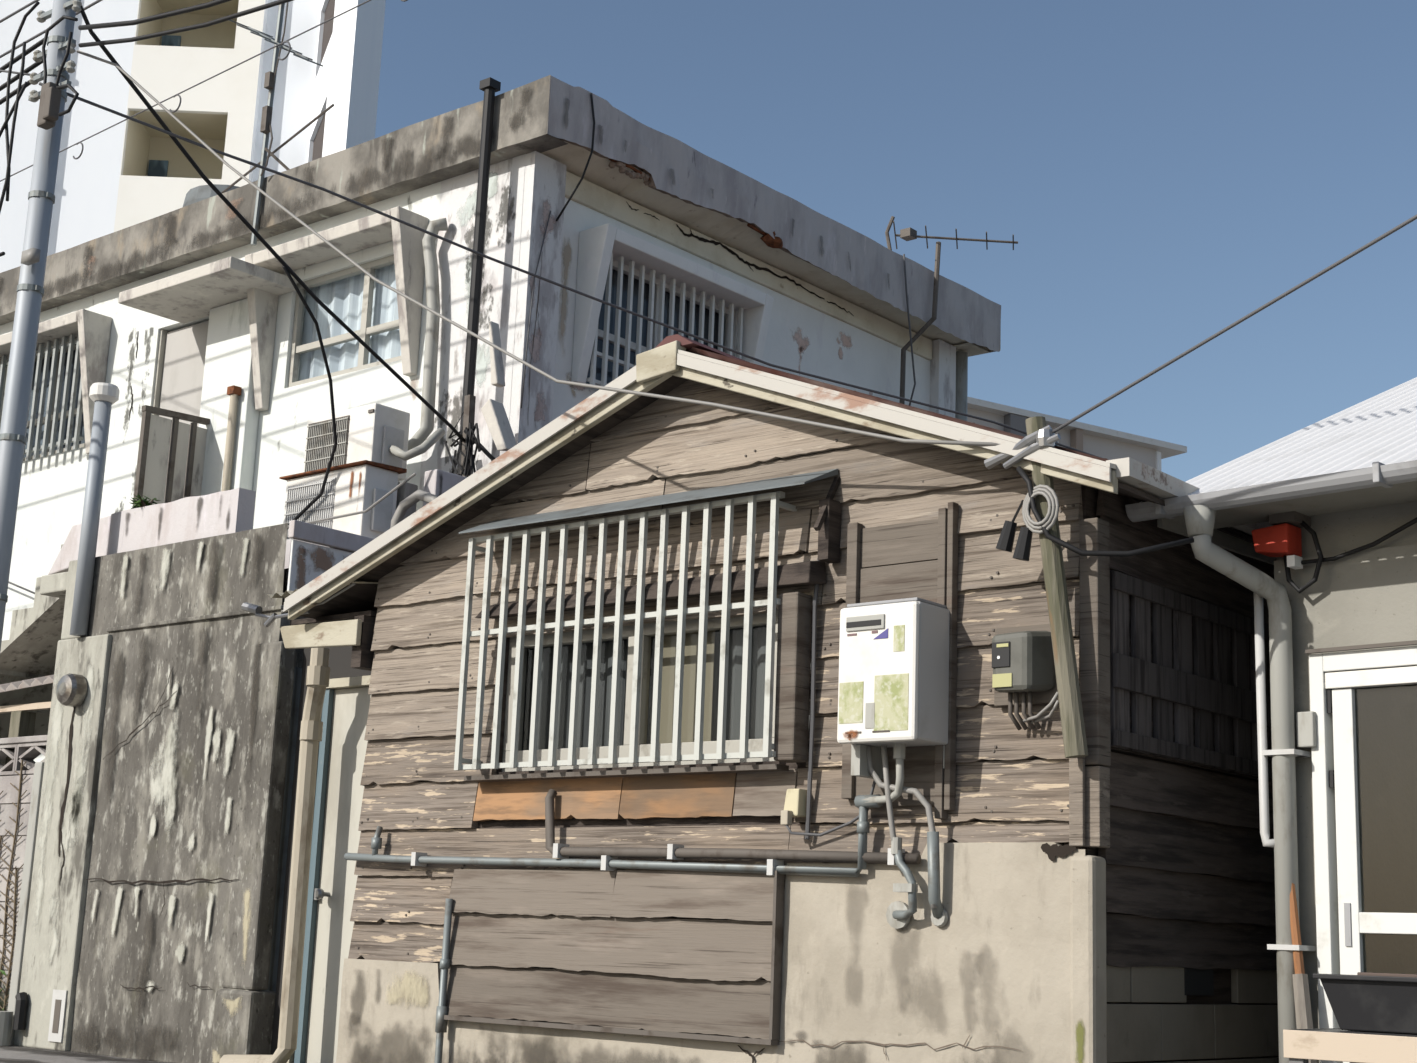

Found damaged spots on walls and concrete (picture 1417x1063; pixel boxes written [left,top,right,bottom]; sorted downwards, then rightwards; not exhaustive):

damp [330,116,480,195]
spalling [608,159,653,188]
damp [42,167,312,298]
damp [464,186,516,331]
crack [627,203,854,316]
spalling [747,223,783,249]
damp [435,390,462,496]
damp [208,511,229,598]
peeling [297,546,334,589]
damp [249,642,260,760]
damp [351,975,378,1023]
crack [738,1035,1021,1063]